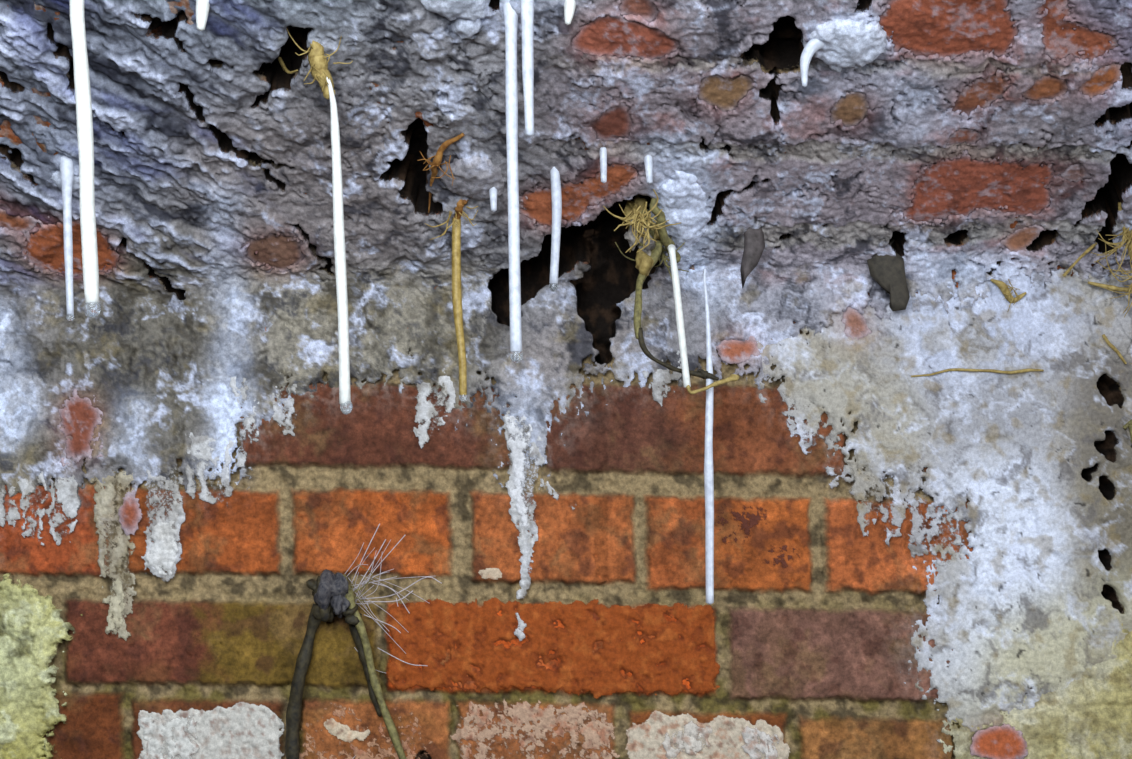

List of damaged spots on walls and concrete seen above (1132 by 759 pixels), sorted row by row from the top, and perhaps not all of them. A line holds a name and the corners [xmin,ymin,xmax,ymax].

crack [47,23,75,91]
crack [136,10,224,65]
spalling [698,15,804,125]
crack [0,144,35,185]
crack [179,82,286,191]
peeling [870,0,1122,257]
crack [1074,62,1132,255]
leakage [0,0,683,641]
leakage [509,0,1132,733]
hole [1081,430,1119,500]
spalling [1098,549,1124,614]
spalling [385,597,720,699]